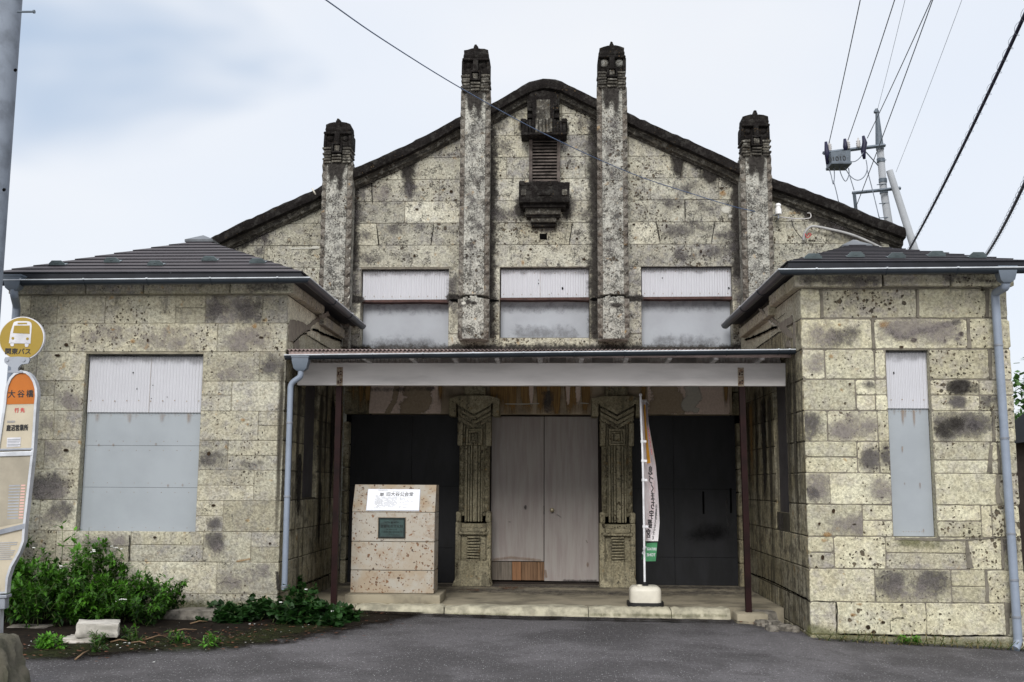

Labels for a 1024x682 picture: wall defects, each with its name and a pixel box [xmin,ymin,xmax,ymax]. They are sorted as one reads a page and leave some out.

leakage [466,91,484,116]
leakage [603,87,620,127]
leakage [348,117,741,351]
crack [294,328,342,349]
peeling [369,386,442,413]
peeling [647,386,730,414]
leakage [786,327,876,515]
leakage [933,380,996,441]
leakage [747,387,783,529]
leakage [32,472,73,520]
leakage [206,518,224,551]
leakage [875,570,950,599]